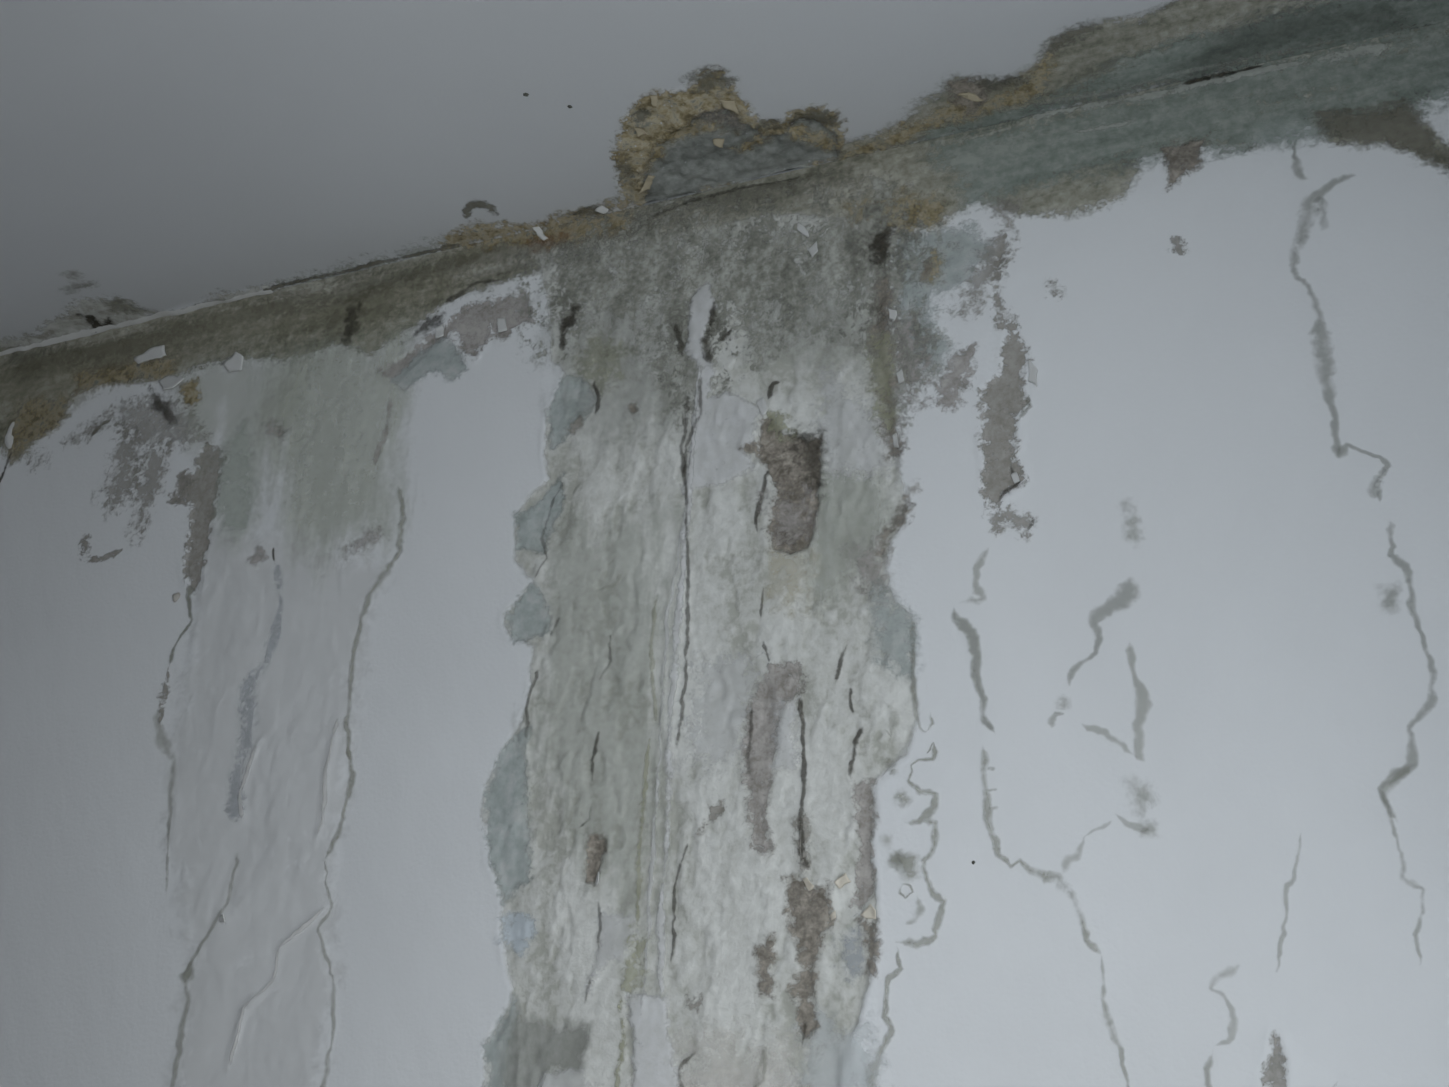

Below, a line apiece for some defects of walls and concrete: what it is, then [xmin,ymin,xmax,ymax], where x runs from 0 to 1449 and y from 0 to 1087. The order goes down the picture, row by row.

leakage [0,0,1449,538]
leakage [79,535,122,562]
leakage [92,420,227,722]
leakage [250,546,274,564]
peeling [380,68,927,1087]
leakage [849,490,916,675]
leakage [954,618,985,701]